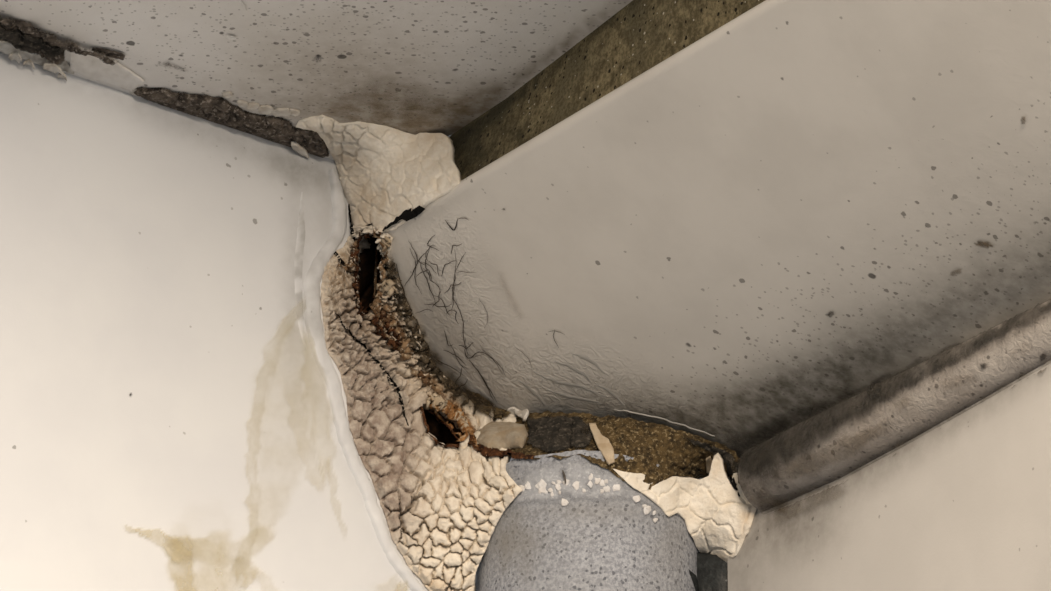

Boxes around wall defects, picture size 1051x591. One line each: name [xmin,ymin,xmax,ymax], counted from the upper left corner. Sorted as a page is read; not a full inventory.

peeling [0,41,145,92]
peeling [376,278,399,297]
corrosion [337,229,535,459]
peeling [425,391,469,429]
crack [396,218,532,402]
water stain [728,299,1051,471]
peeling [513,423,658,523]